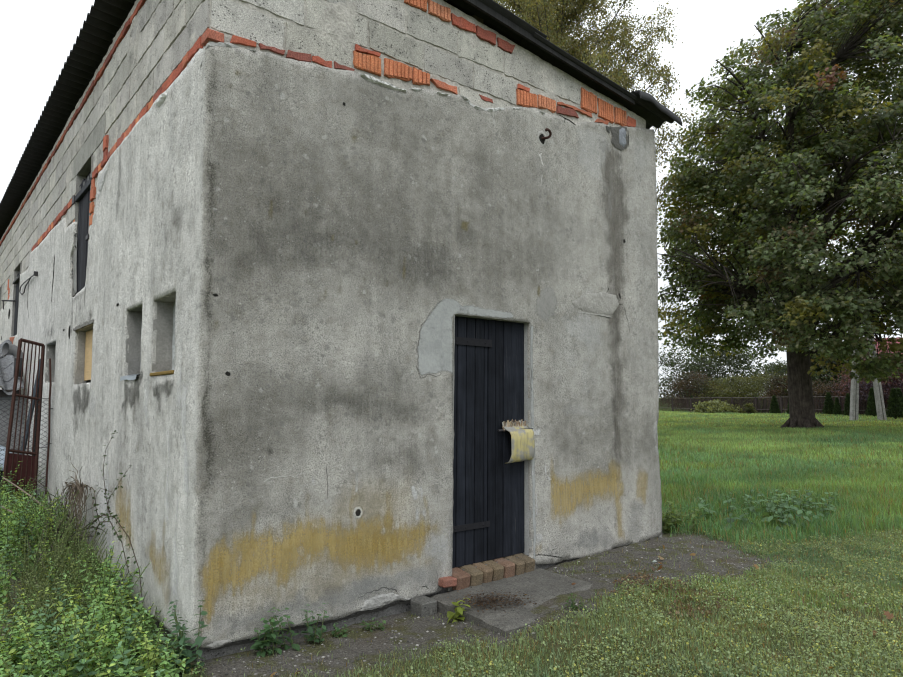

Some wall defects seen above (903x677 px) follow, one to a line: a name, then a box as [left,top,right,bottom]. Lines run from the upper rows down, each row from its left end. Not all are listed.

spalling [359,73,424,92]
water stain [604,142,627,448]
water stain [122,372,142,407]
water stain [204,513,429,615]